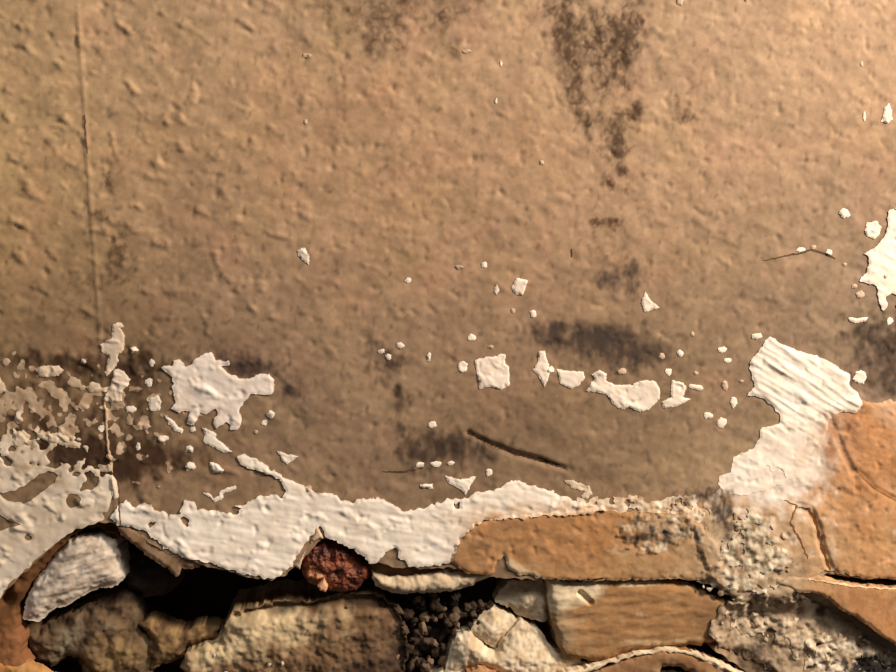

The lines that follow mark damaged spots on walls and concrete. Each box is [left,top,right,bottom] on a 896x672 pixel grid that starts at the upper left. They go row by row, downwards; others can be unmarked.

water stain [595,20,643,85]
peeling [881,103,893,123]
peeling [859,208,896,311]
water stain [533,321,564,346]
water stain [571,327,662,369]
peeling [0,322,607,598]
water stain [396,432,486,470]
crack [784,500,896,585]
water stain [852,653,896,672]